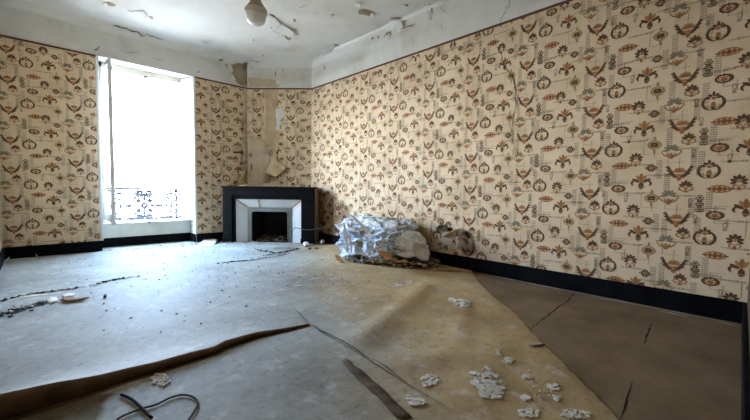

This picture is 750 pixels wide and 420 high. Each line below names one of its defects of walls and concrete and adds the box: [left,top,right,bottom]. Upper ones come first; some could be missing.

peeling [354,3,375,18]
peeling [371,17,406,39]
flaking render [225,62,280,88]
crack [620,383,632,419]